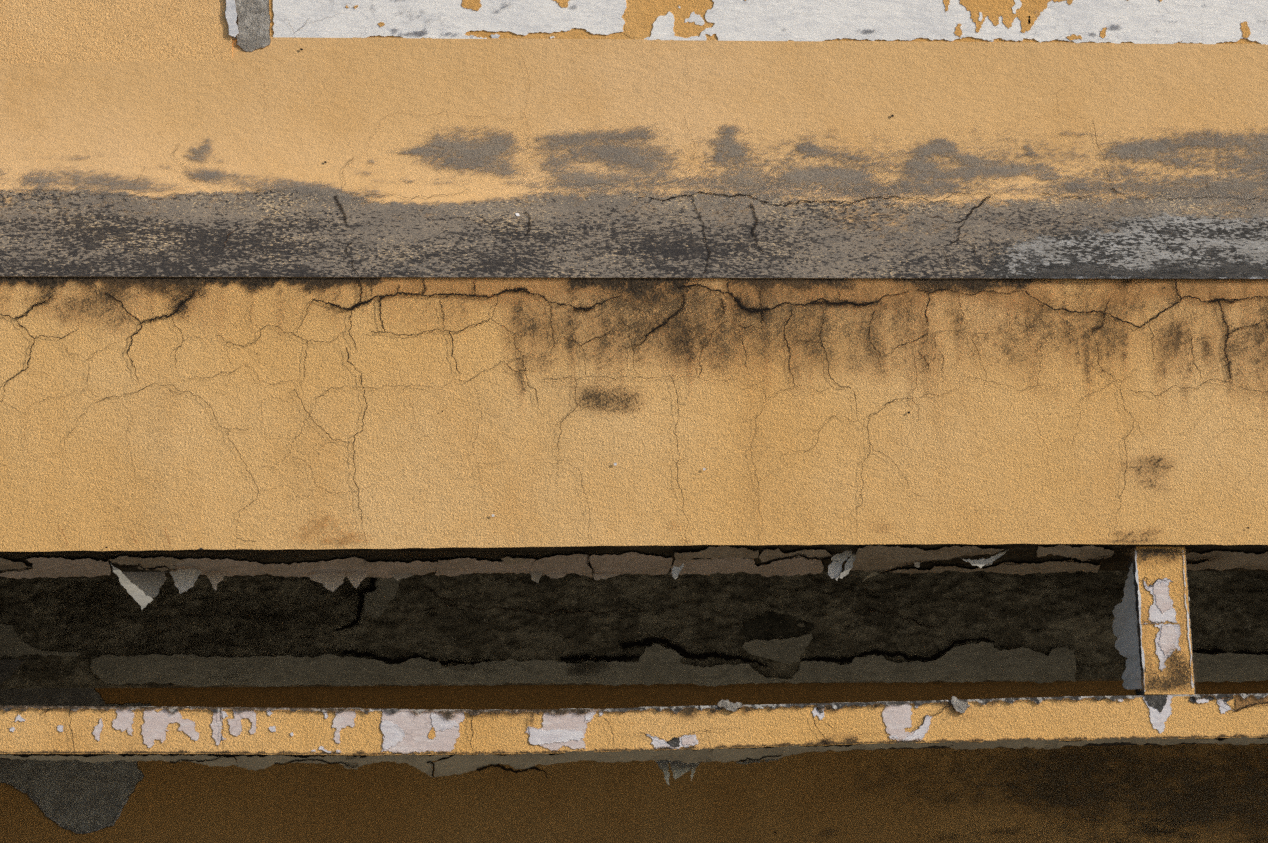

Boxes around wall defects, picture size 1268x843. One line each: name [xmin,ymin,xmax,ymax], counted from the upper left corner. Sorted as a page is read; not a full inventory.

peeling [461,0,481,11]
peeling [623,0,714,40]
peeling [943,0,1073,37]
peeling [1240,21,1251,38]
leakage [0,124,1268,413]
crack [0,90,1268,667]
flaking render [0,544,1268,834]
leakage [0,733,1268,841]